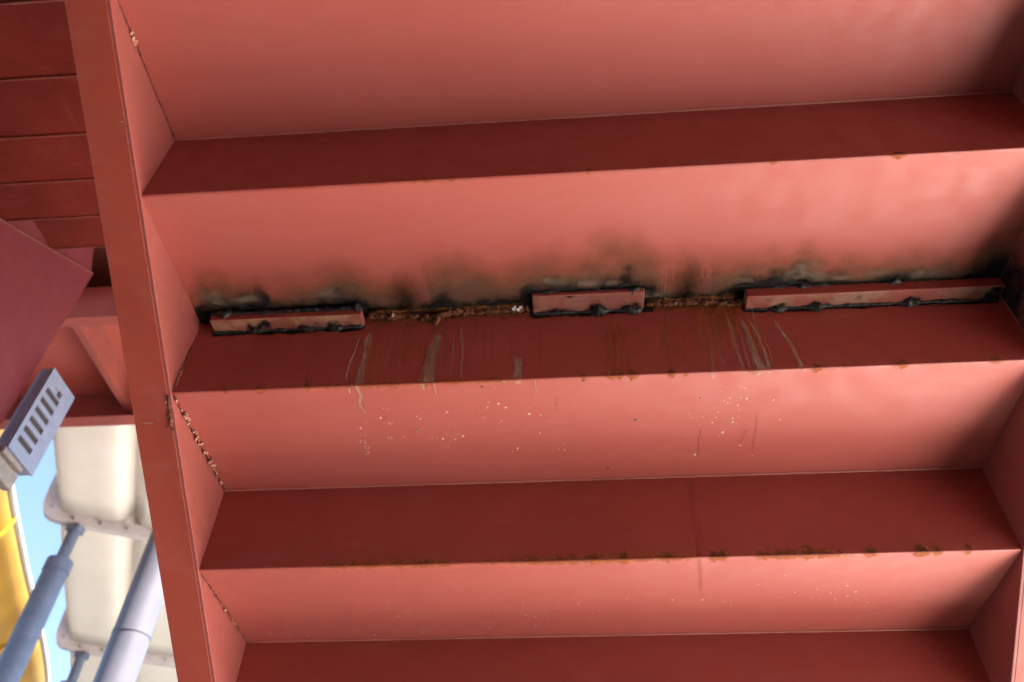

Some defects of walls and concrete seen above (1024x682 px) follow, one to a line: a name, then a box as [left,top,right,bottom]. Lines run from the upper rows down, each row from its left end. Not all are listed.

peeling [165,395,227,492]
rust [329,558,451,569]
rust [491,552,689,565]
rust [709,550,729,562]
rust [757,546,843,561]
rust [914,543,943,557]